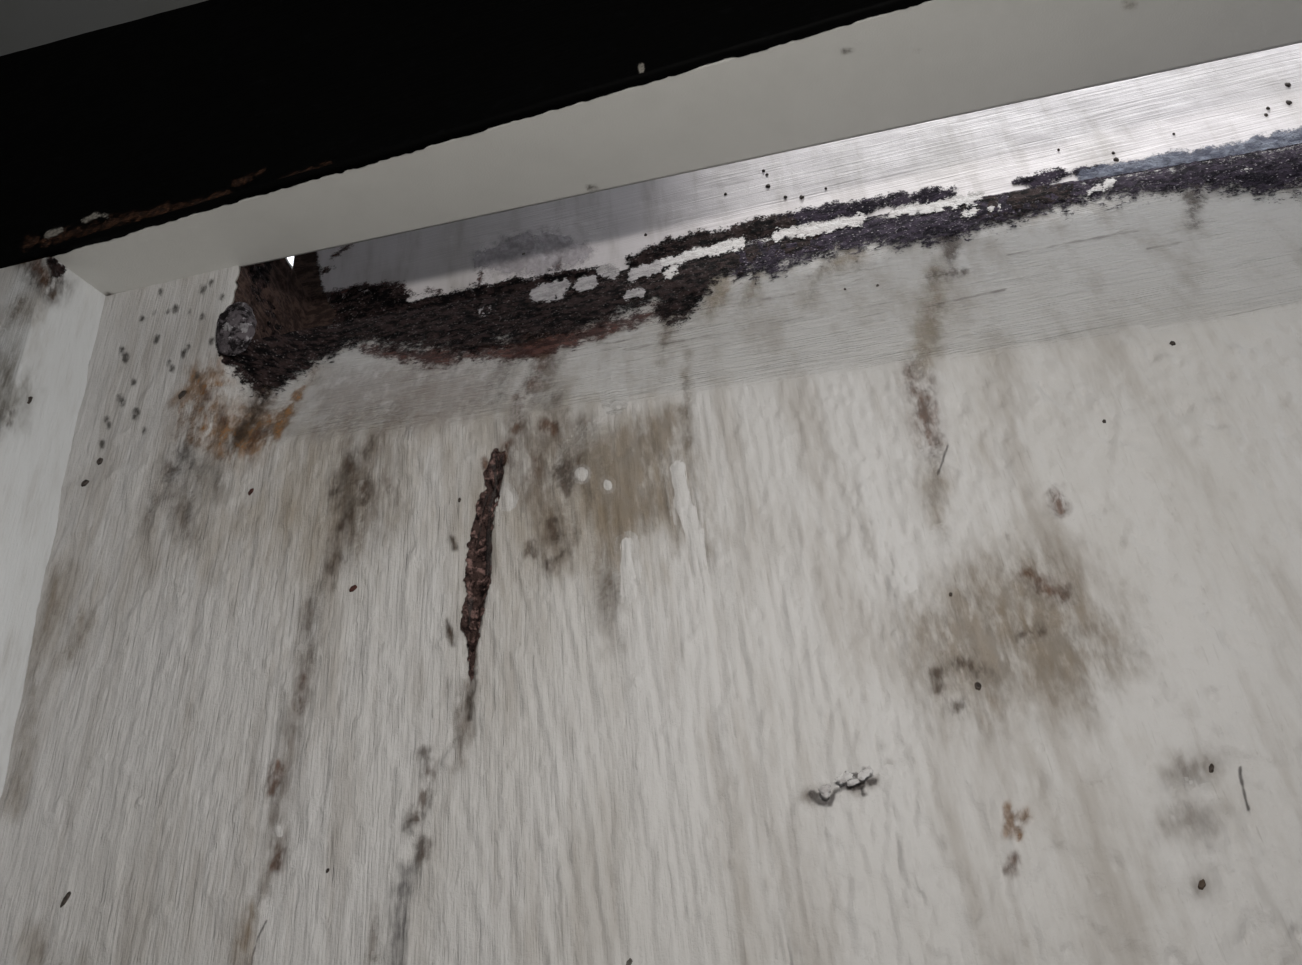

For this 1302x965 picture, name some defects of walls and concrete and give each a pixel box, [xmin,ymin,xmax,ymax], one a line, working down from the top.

peeling [475,234,592,273]
rust [174,370,302,456]